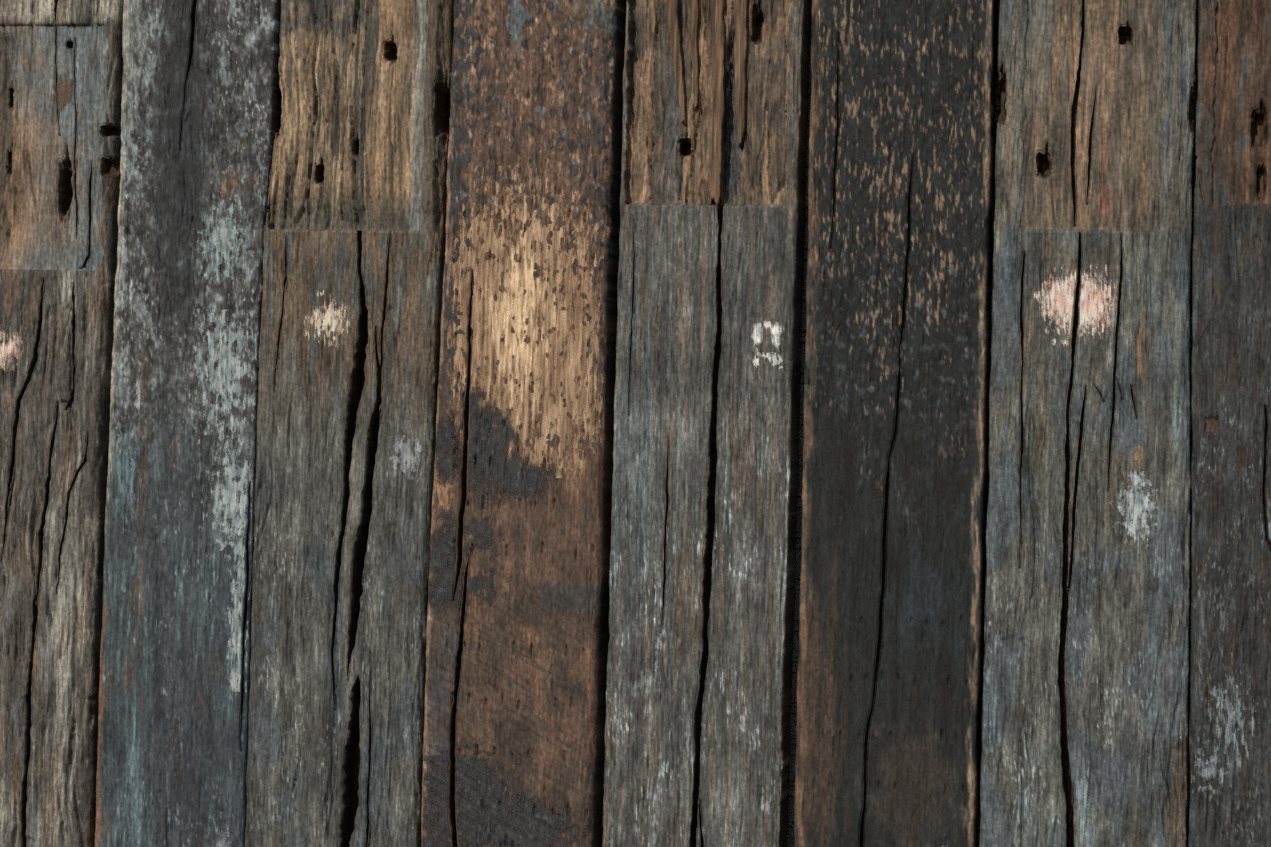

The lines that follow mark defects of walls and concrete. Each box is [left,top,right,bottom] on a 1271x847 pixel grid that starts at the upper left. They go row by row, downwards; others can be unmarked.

crack [1,0,94,847]
crack [329,231,392,847]
crack [447,269,474,847]
crack [660,433,670,633]
crack [687,205,725,847]
crack [858,155,914,847]
crack [1056,0,1138,847]